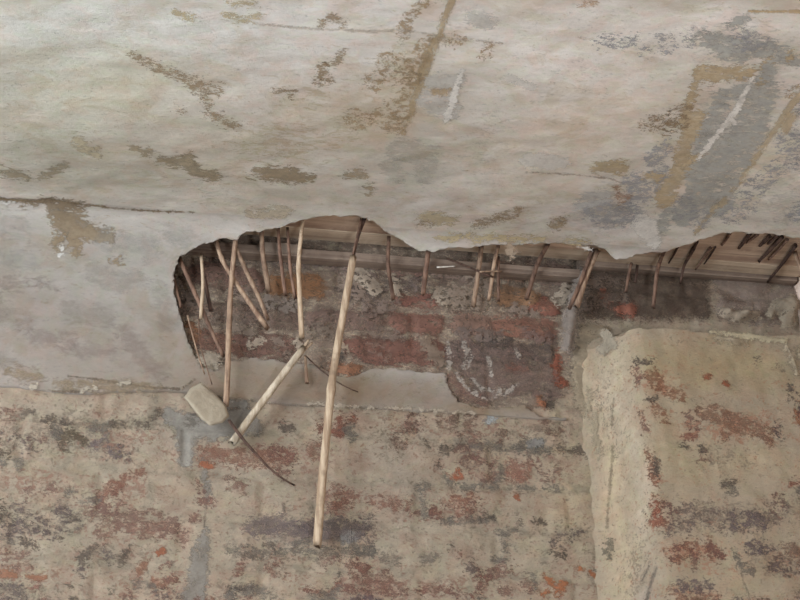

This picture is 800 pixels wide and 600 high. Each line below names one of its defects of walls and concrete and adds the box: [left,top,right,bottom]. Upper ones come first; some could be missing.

water stain [343,0,467,135]
water stain [693,85,800,234]
spalling [173,256,584,520]